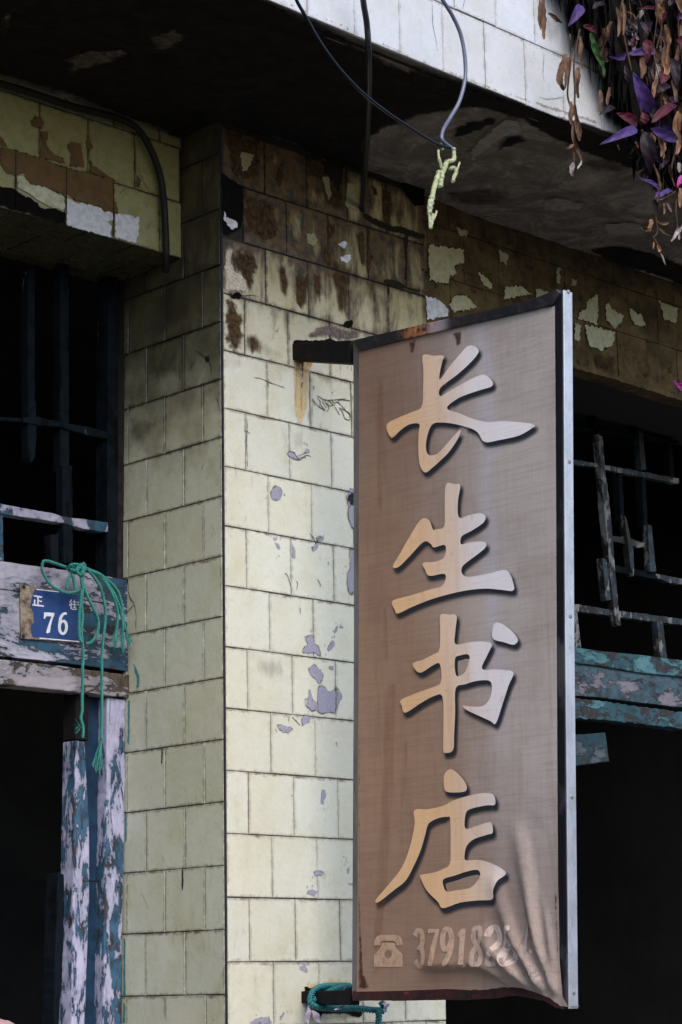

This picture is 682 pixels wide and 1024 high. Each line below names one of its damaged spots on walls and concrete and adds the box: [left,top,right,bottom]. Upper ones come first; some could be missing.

peeling [0,116,140,243]
peeling [428,227,469,284]
flaking render [426,294,477,320]
peeling [478,272,548,300]
peeling [574,295,645,352]
peeling [659,300,678,324]
spalling [266,485,285,501]
spalling [346,488,354,529]
spalling [343,547,354,595]
spalling [275,624,342,734]